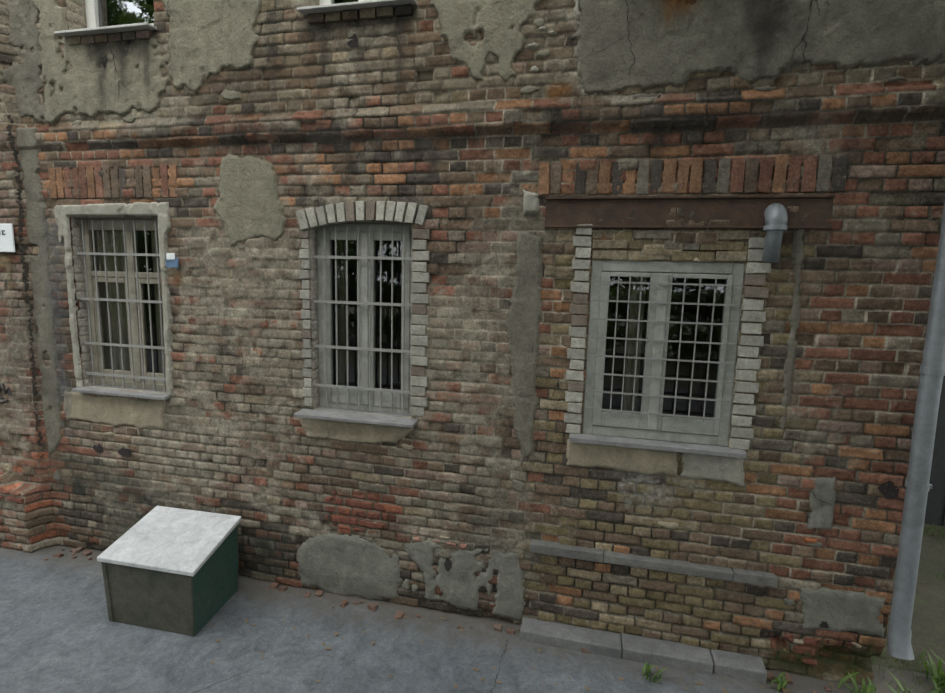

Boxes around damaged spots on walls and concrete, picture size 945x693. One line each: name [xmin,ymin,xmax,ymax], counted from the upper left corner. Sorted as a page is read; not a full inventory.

peeling [430,0,557,95]
peeling [570,0,945,100]
crack [786,0,820,70]
peeling [0,0,263,455]
peeling [214,154,287,247]
peeling [297,491,526,620]
peeling [768,586,885,666]